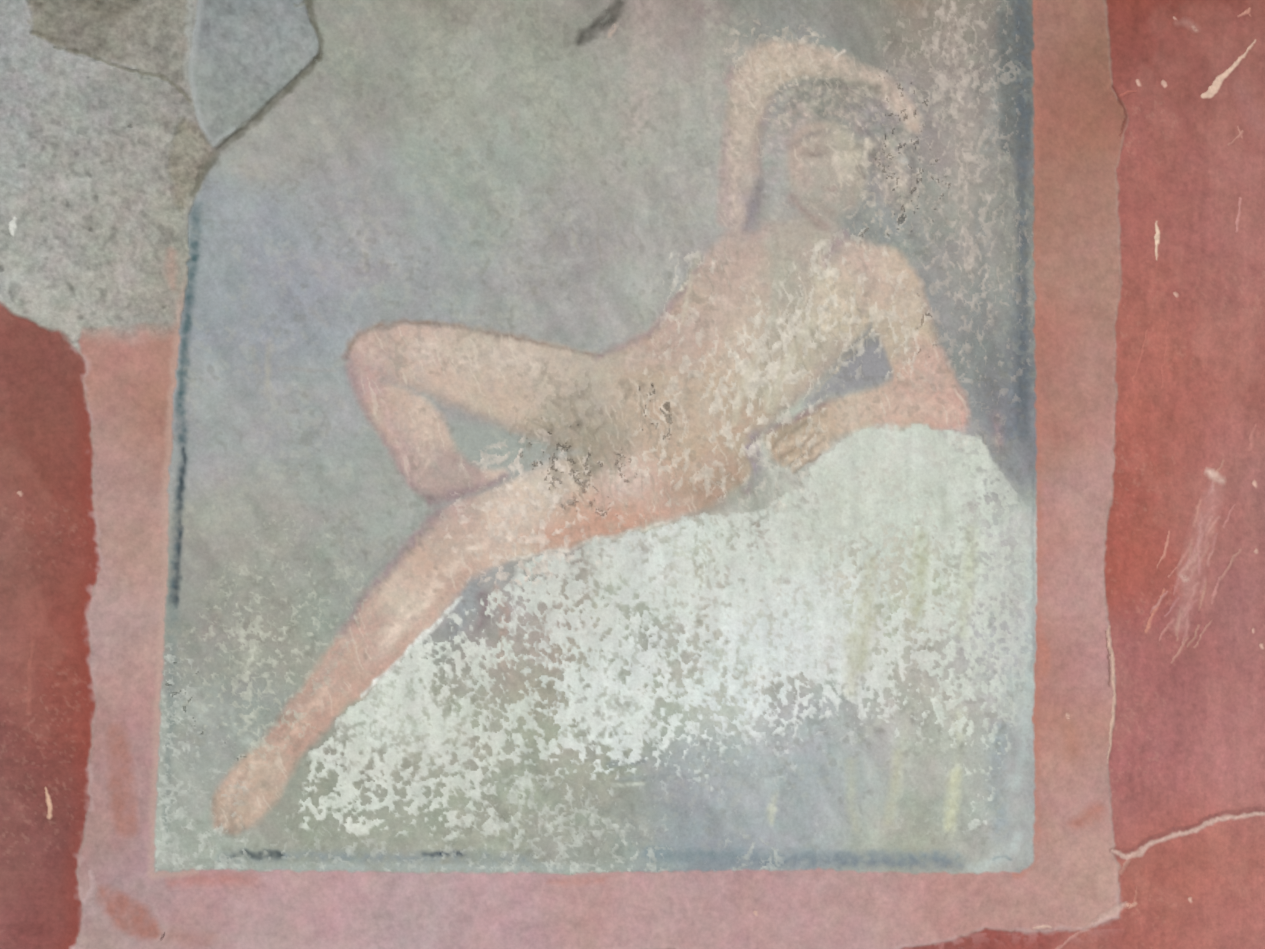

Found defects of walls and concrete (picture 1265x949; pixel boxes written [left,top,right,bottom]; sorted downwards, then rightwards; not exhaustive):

peeling [1200,39,1258,99]
spalling [24,0,214,217]
spalling [8,216,18,238]
peeling [104,0,1054,891]
crack [1109,806,1265,876]